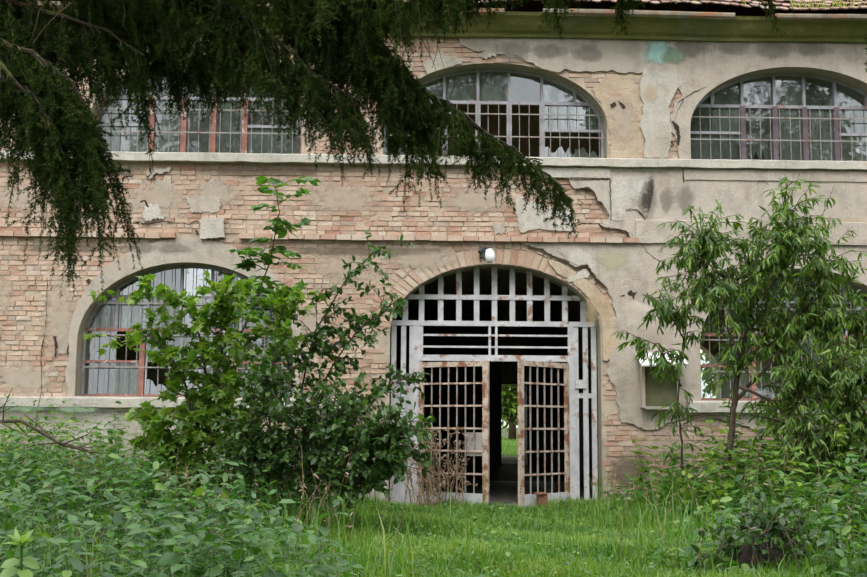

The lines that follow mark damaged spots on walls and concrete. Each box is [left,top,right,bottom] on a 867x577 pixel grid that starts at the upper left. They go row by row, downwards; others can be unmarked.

flaking render [379,38,539,76]
peeling [560,69,683,159]
leakage [642,183,692,211]
flaking render [0,84,655,400]
flaking render [602,412,799,497]